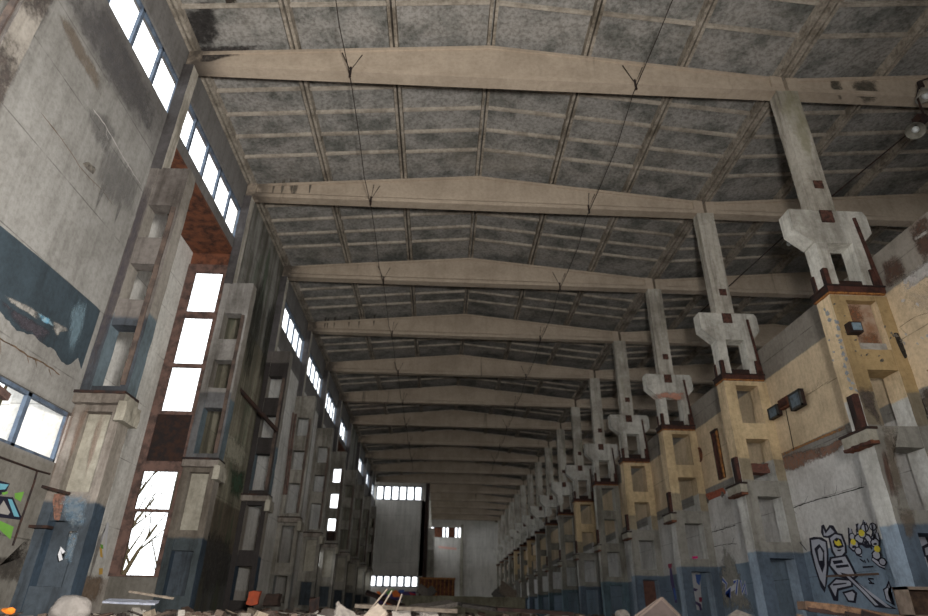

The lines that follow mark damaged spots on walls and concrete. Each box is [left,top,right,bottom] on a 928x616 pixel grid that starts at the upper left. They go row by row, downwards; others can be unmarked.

damp [187,3,218,47]
peeling [0,226,100,369]